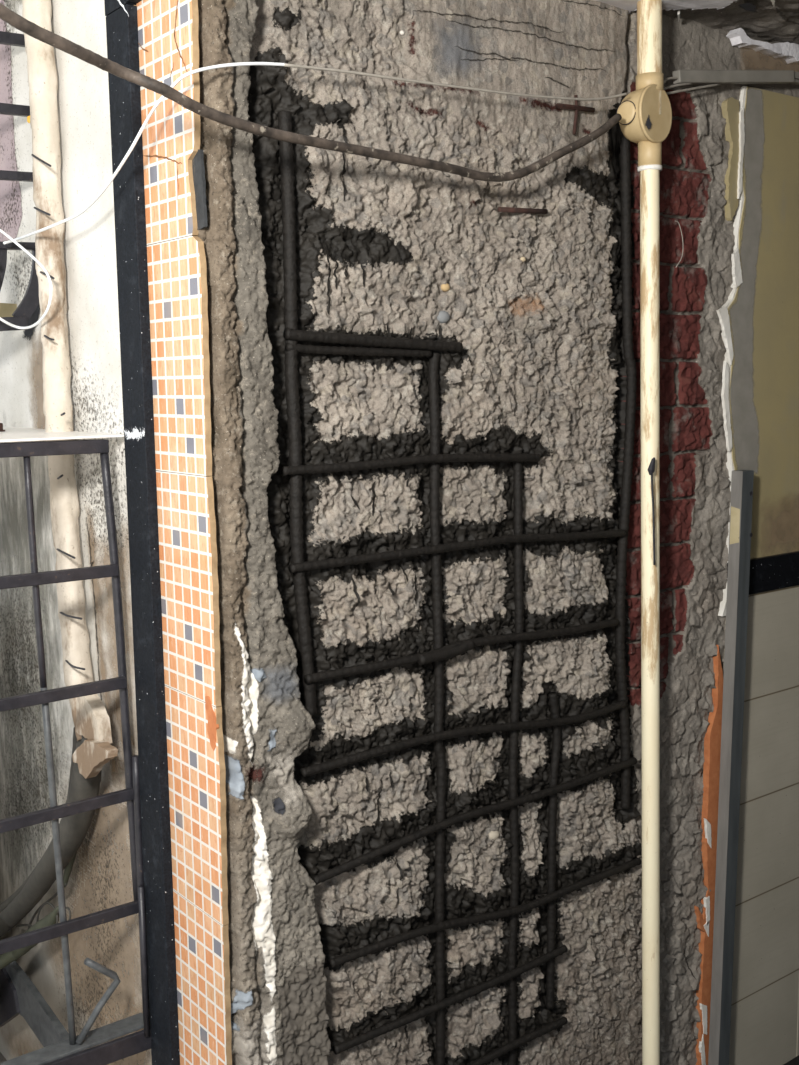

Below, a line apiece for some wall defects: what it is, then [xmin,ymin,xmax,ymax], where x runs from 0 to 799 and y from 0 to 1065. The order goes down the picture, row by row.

crack [170,1,187,76]
crack [412,10,615,88]
crack [563,0,622,16]
spalling [193,0,642,1065]
flaking render [660,0,799,1065]